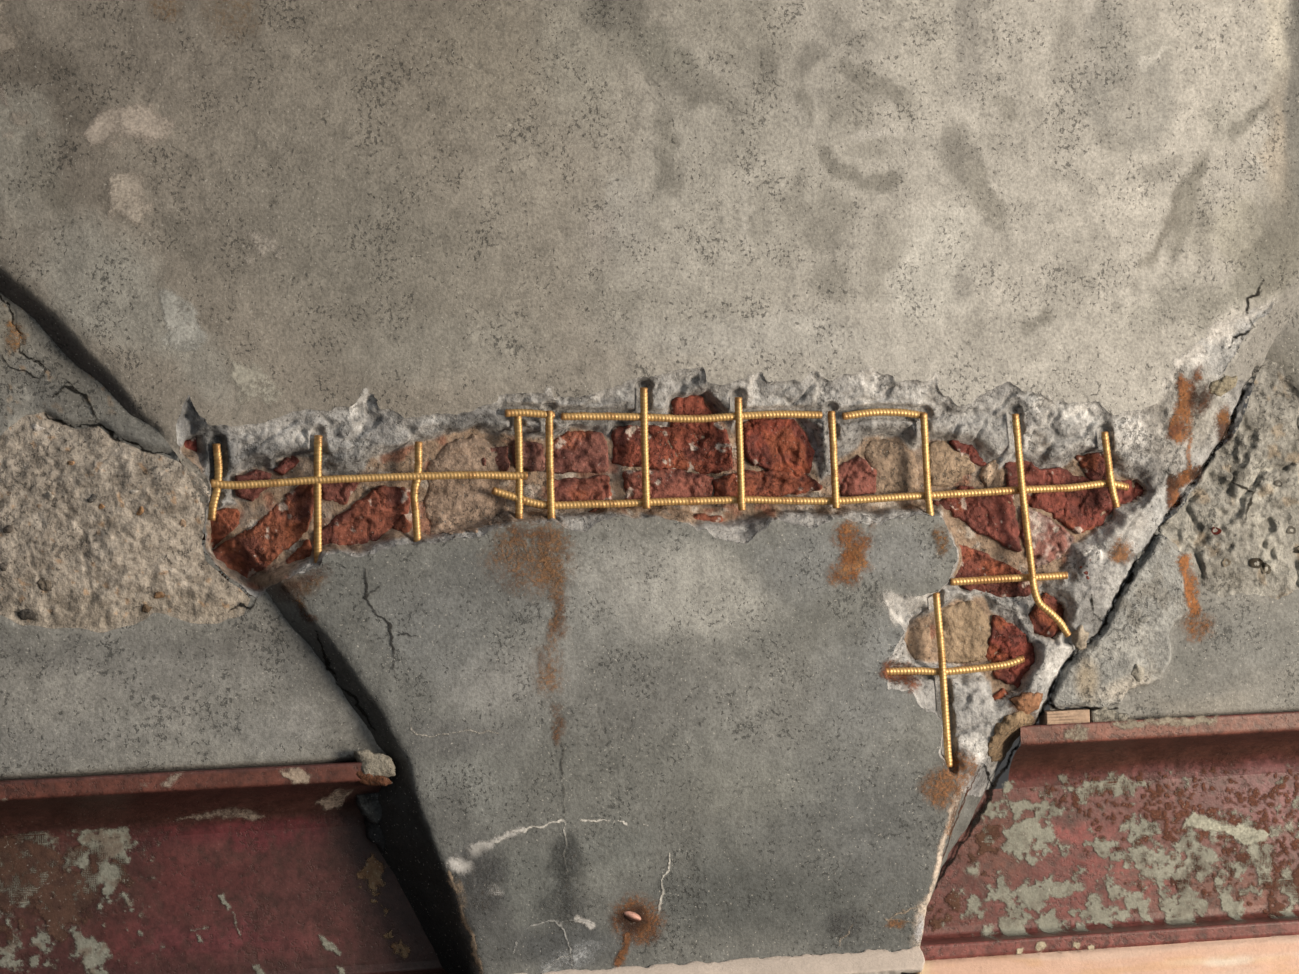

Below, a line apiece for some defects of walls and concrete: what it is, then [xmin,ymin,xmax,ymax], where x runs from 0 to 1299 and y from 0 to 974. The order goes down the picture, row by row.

crack [0,295,170,455]
corrosion [1166,370,1231,509]
crack [363,569,417,677]
spalling [176,302,1299,946]
corrosion [828,520,872,584]
crack [885,365,1266,924]
corrosion [1178,554,1211,638]
peeling [0,827,143,974]
peeling [319,935,345,974]
peeling [448,871,483,974]
corrosion [613,895,660,967]
crack [658,853,670,912]